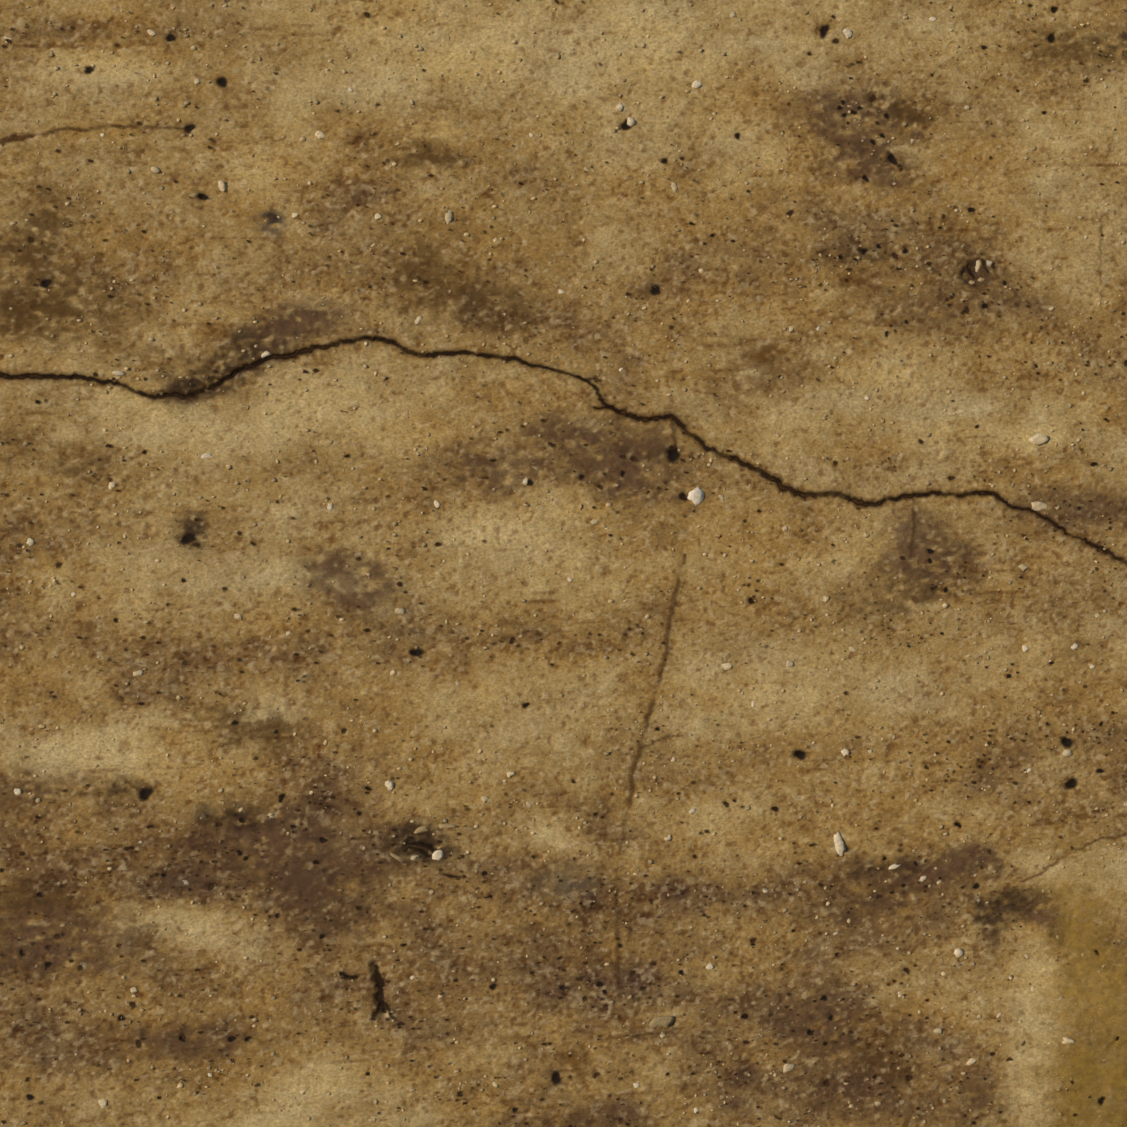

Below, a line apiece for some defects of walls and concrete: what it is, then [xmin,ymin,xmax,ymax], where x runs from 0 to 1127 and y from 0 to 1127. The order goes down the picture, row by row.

crack [0,336,1127,564]